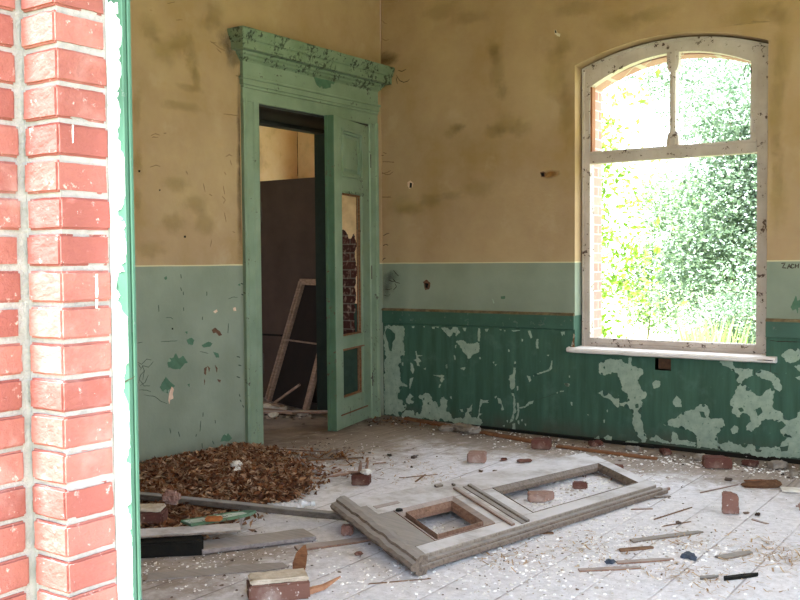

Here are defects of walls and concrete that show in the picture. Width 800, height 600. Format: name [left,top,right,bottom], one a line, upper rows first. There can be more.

peeling [383,325,533,429]
peeling [599,357,800,458]
peeling [781,348,800,380]